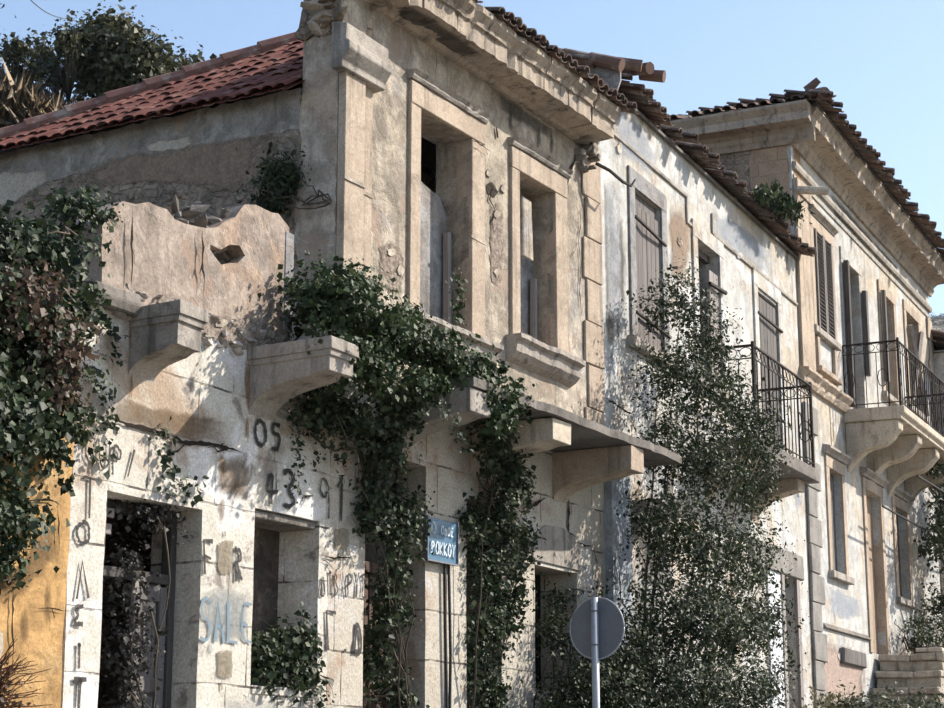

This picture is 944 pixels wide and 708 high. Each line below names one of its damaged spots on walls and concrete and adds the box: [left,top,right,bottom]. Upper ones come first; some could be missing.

peeling [145,136,192,152]
crack [128,211,136,283]
crack [198,237,206,296]
peeling [485,169,508,285]
spalling [202,314,282,350]
crack [114,420,240,452]